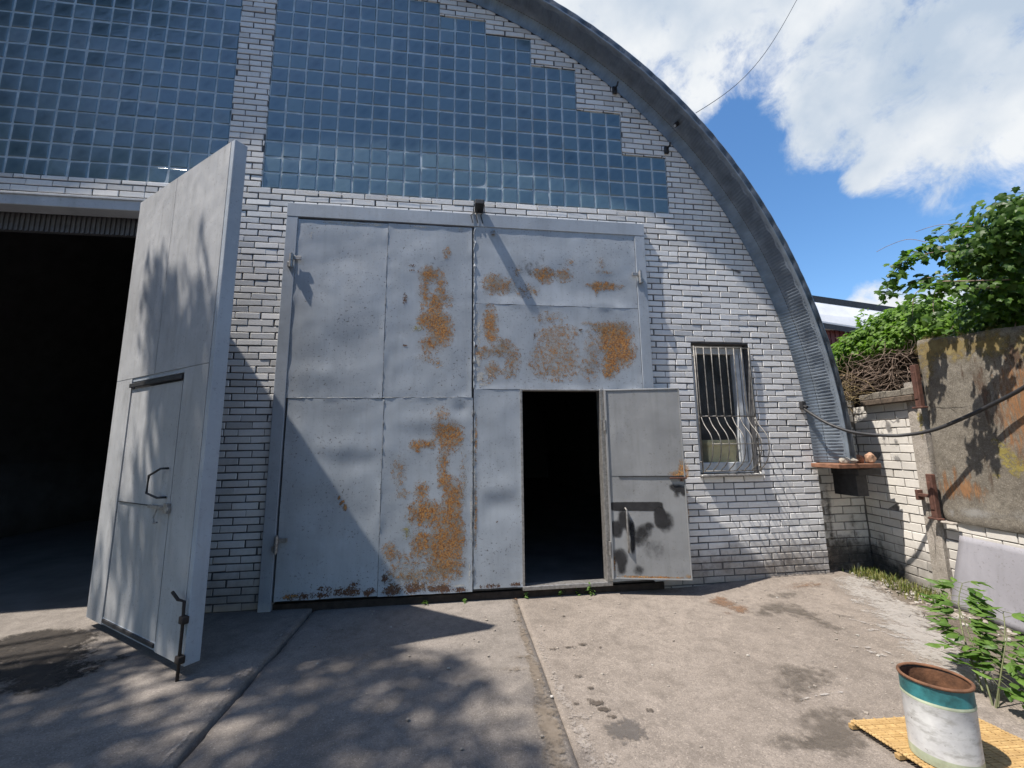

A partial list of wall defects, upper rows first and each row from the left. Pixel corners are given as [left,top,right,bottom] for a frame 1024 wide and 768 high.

corrosion [403,247,455,368]
corrosion [475,258,637,384]
corrosion [283,407,522,601]